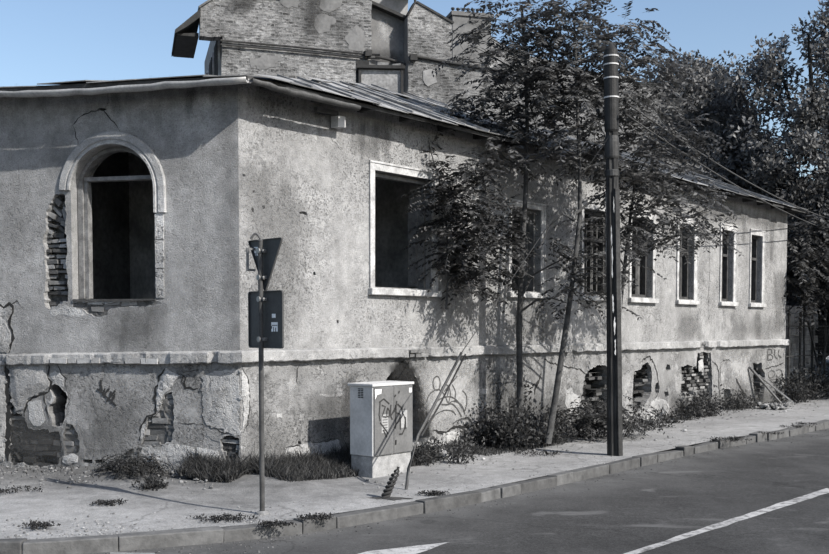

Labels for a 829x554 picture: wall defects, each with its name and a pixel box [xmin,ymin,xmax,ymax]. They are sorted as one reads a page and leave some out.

peeling [314,0,342,34]
peeling [345,24,366,51]
crack [71,96,120,142]
spalling [41,195,163,318]
peeling [0,307,12,353]
crack [0,301,70,461]
spalling [0,364,81,467]
spalling [140,368,180,446]
peeling [241,369,250,430]
spalling [565,364,607,426]
spalling [632,362,669,420]
spalling [681,351,713,411]